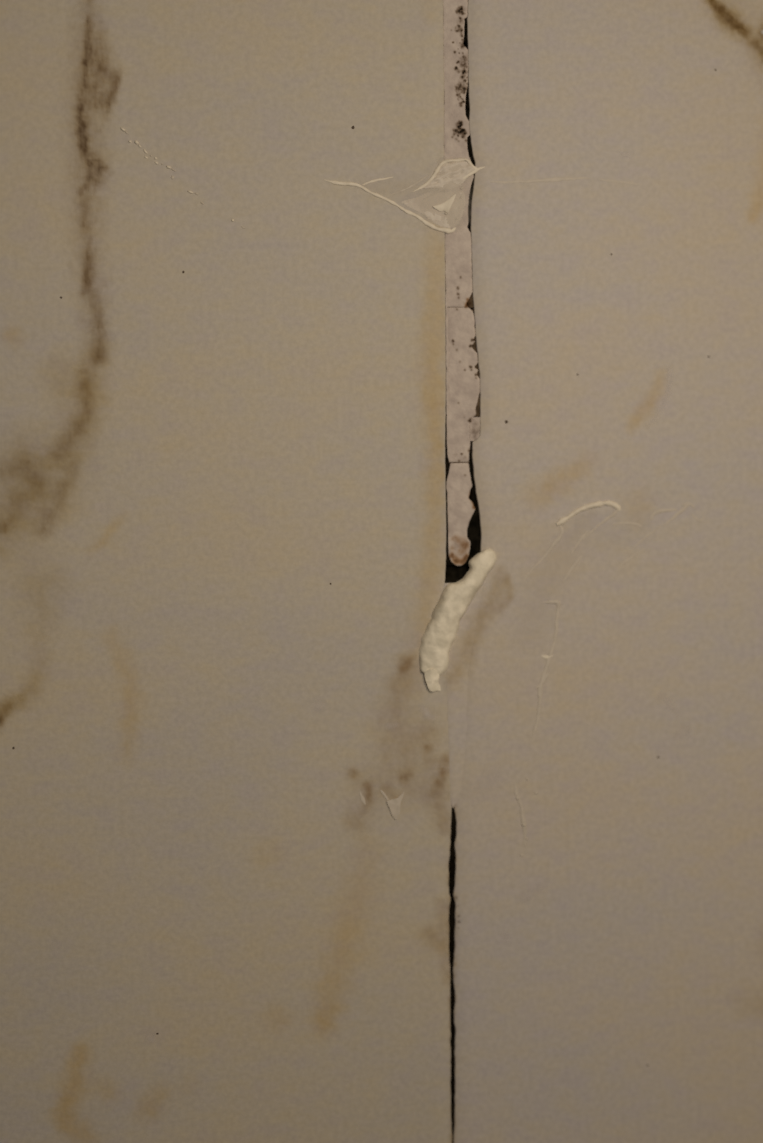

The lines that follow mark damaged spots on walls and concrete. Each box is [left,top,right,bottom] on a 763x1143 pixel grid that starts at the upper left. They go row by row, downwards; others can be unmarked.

crack [461,18,469,48]
crack [465,88,475,231]
crack [445,294,480,565]
crack [448,808,456,1143]